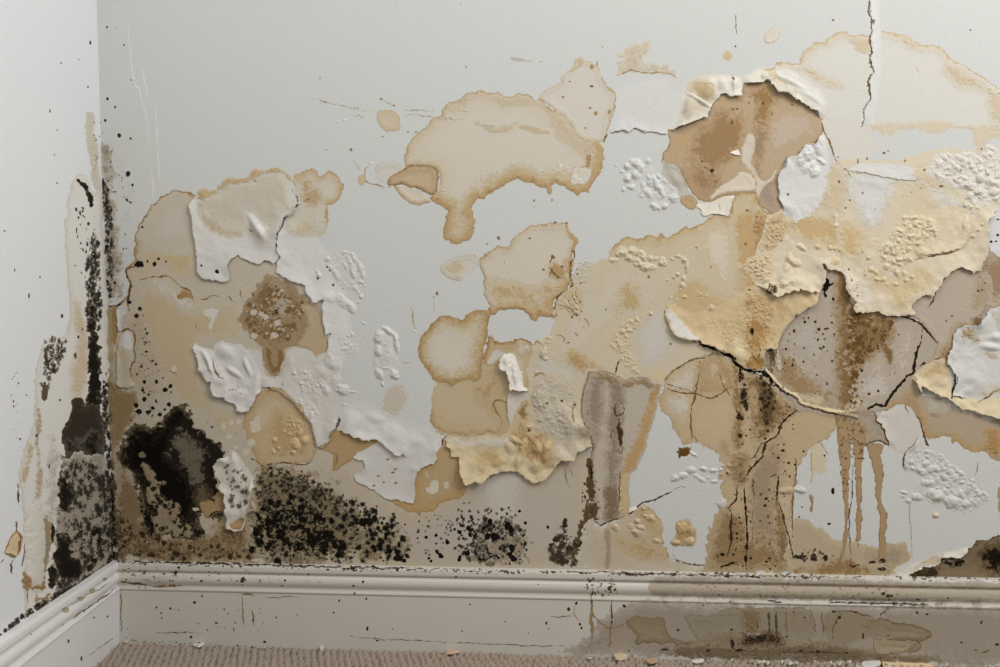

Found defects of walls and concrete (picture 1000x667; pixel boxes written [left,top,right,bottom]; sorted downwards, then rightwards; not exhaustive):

water stain [0,110,534,615]
flaking render [108,80,1000,573]
water stain [353,57,771,438]
crack [580,447,679,526]
crack [664,340,836,571]
water stain [547,349,1000,667]
crack [861,0,875,127]
water stain [774,31,1000,215]
crack [848,250,958,568]